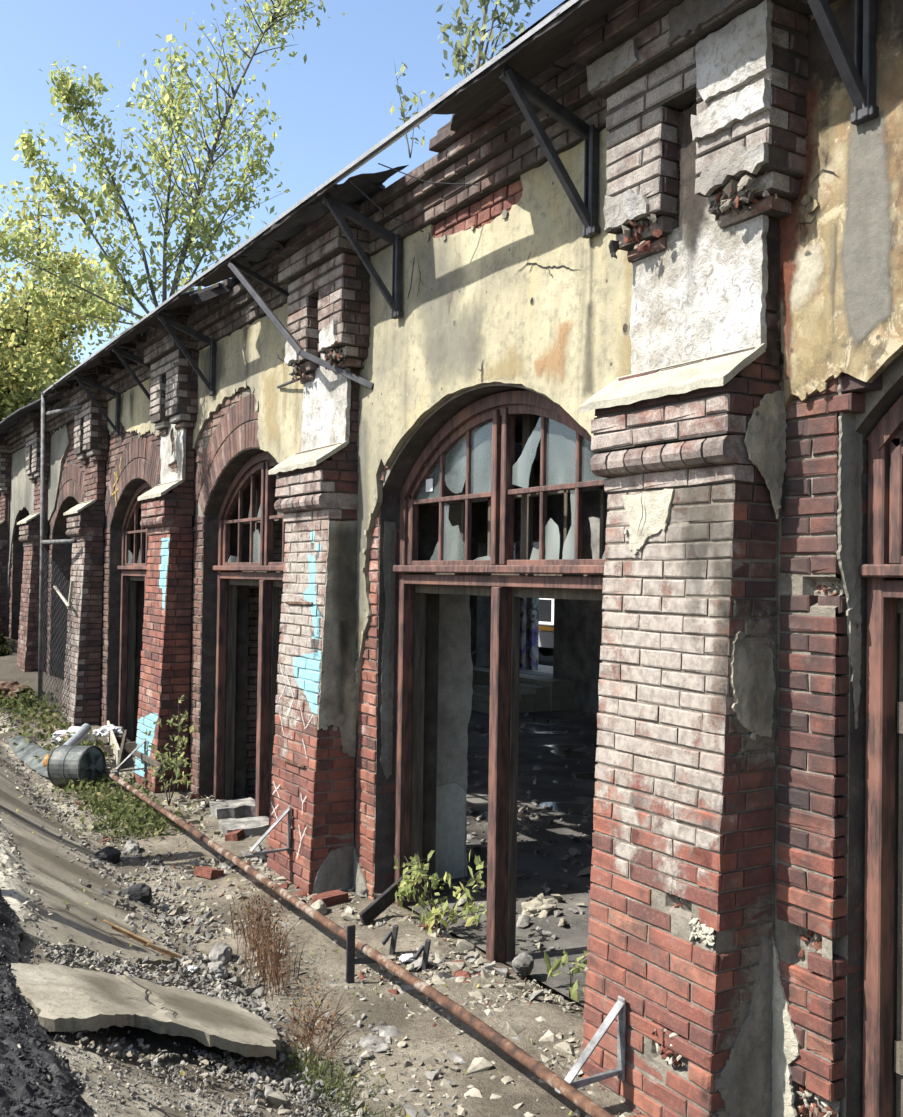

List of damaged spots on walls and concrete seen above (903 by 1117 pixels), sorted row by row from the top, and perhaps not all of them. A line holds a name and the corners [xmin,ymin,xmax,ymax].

water stain [806,16,842,131]
flaking render [424,179,523,242]
crack [518,252,581,278]
flaking render [799,367,847,401]
peeling [817,412,863,729]
peeling [380,521,397,780]
spalling [674,896,715,946]
spalling [798,929,822,958]
spalling [788,1082,837,1117]